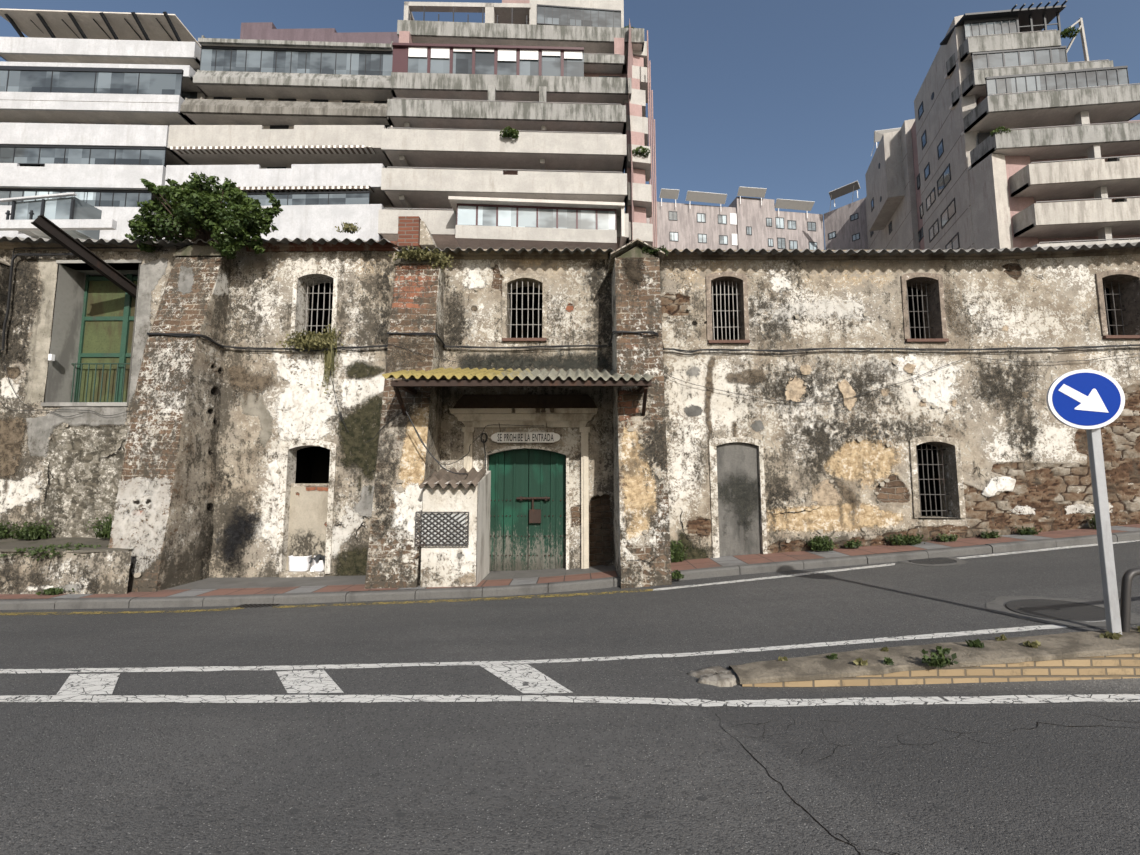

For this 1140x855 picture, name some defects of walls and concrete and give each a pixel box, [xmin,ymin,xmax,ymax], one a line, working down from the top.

peeling [0,367,20,398]
leakage [980,361,1031,404]
flaking render [570,389,658,567]
flaking render [766,436,973,554]
leakage [1015,420,1040,480]